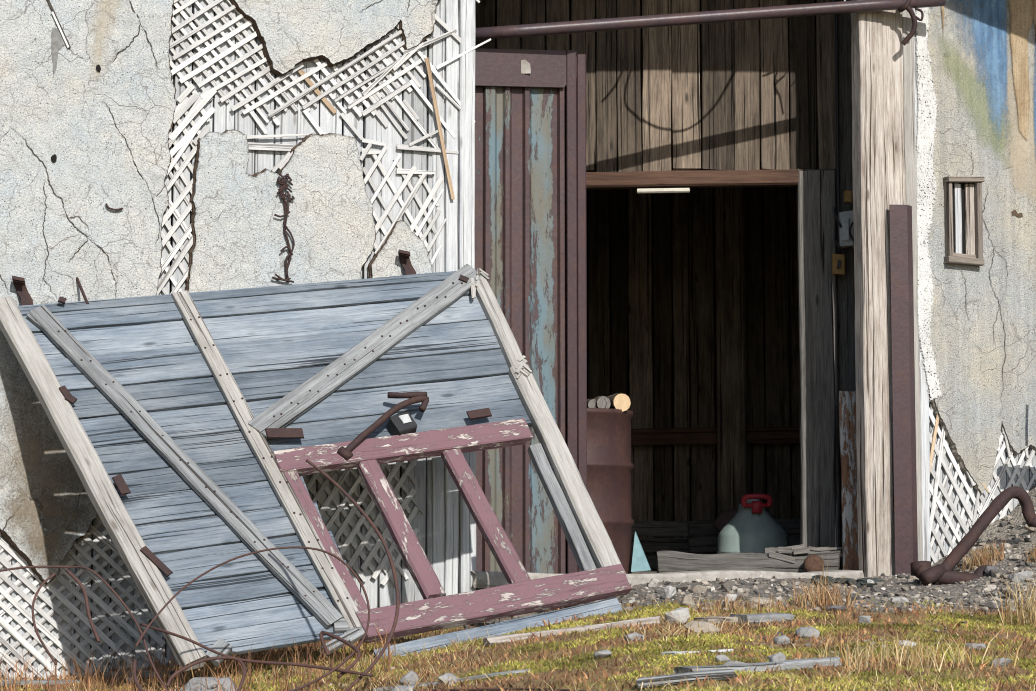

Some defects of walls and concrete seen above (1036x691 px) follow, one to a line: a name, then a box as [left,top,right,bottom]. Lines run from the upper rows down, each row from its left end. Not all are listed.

crack [6,128,116,299]
crack [102,101,166,247]
crack [114,0,160,70]
flaking render [156,0,491,295]
flaking render [915,7,1036,565]
damp [948,0,1036,191]
crack [959,153,1031,415]
crack [2,493,81,536]
flaking render [0,515,169,691]